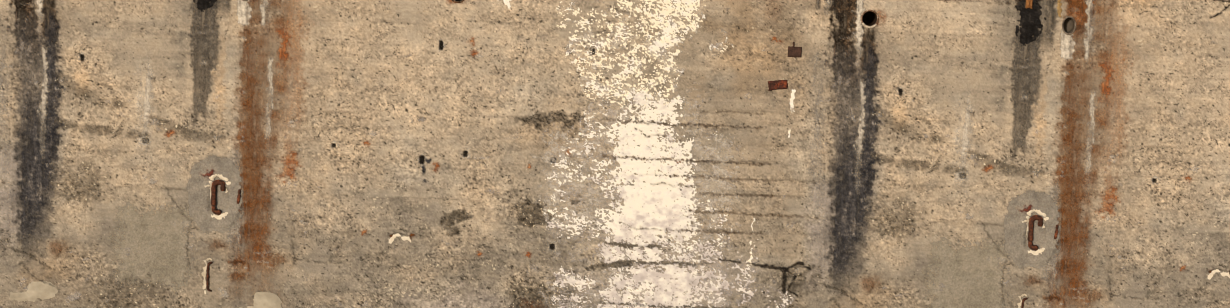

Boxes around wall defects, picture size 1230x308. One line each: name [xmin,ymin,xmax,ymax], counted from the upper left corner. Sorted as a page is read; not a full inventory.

leakage [0,0,63,238]
leakage [190,0,230,114]
corrosion [228,0,302,286]
peeling [509,0,820,308]
leakage [811,0,880,273]
leakage [1010,0,1056,149]
corrosion [1043,0,1126,308]